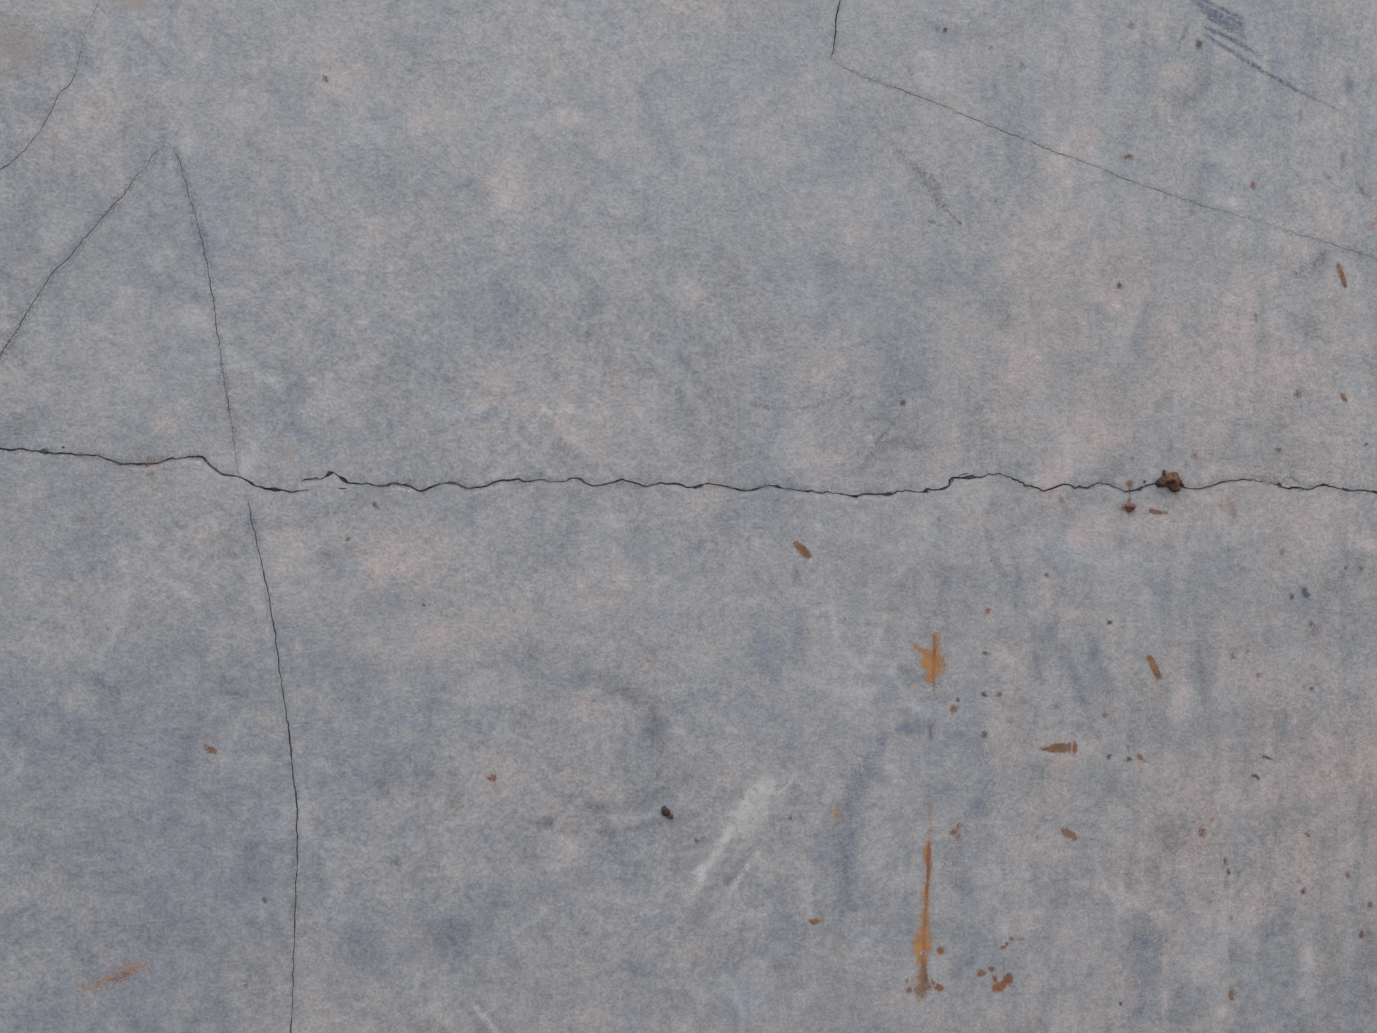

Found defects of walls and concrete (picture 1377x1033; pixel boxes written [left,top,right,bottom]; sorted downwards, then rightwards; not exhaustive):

crack [0,2,99,172]
crack [830,0,1374,258]
rust [1336,262,1347,289]
crack [1175,475,1377,498]
rust [791,541,812,559]
crack [0,144,1169,1033]
rust [912,631,948,693]
rust [1146,655,1161,679]
rust [1026,742,1078,755]
rust [904,802,959,1002]